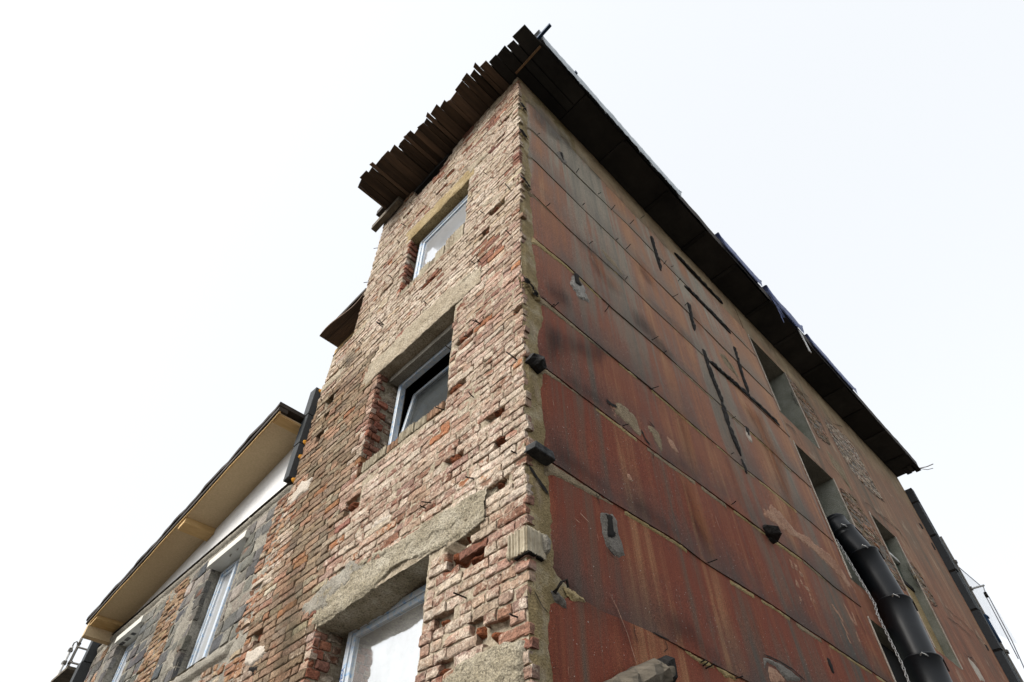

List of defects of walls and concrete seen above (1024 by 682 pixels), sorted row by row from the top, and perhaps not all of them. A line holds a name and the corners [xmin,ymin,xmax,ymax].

spalling [570,272,589,303]
peeling [606,399,679,453]
spalling [453,553,486,568]
spalling [600,513,625,558]
peeling [763,504,856,593]